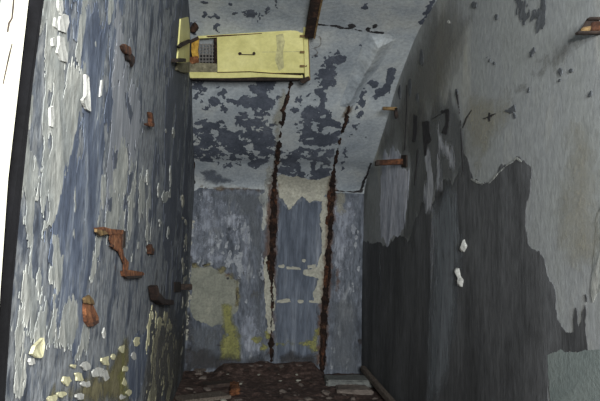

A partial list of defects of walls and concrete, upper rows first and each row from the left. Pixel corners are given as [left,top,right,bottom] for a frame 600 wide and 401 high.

peeling [418,0,435,25]
peeling [11,0,419,401]
crack [336,163,372,193]
corrosion [375,155,407,167]
flaking render [412,114,431,156]
peeling [350,146,600,401]
damp [81,341,129,401]
damp [149,304,270,401]